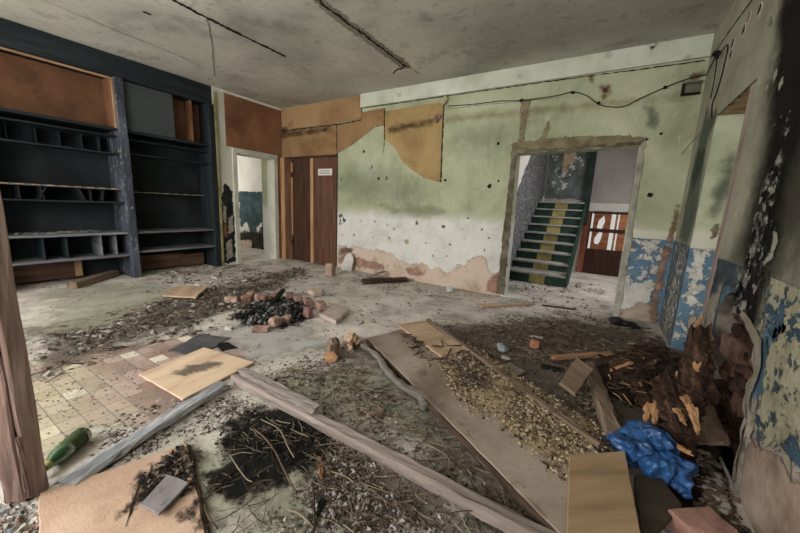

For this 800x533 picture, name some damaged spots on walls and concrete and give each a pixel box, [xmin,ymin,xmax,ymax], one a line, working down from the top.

crack [46,0,286,76]
crack [286,0,752,182]
peeling [221,183,263,264]
flaking render [337,245,501,296]
peeling [619,155,800,533]